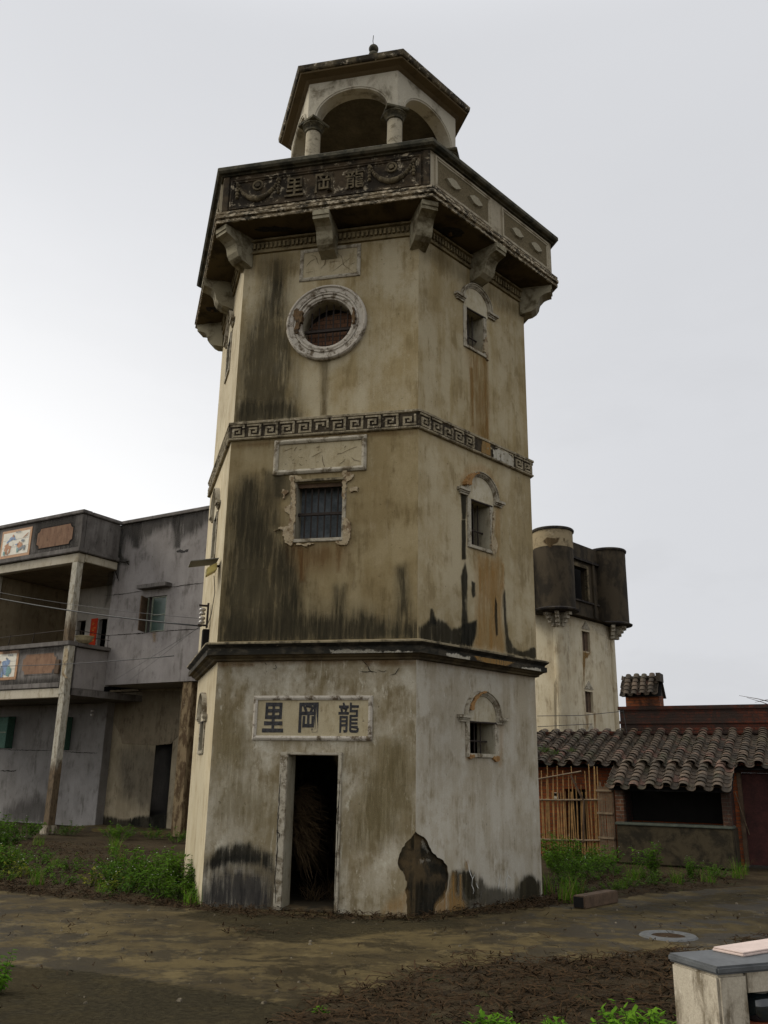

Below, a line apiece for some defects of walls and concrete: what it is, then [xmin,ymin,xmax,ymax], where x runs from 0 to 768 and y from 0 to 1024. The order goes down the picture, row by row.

damp [239,264,296,421]
peeling [274,475,315,547]
peeling [335,518,351,546]
damp [220,479,477,660]
peeling [342,470,359,501]
damp [495,592,536,659]
damp [183,837,540,942]
spalling [398,832,449,917]